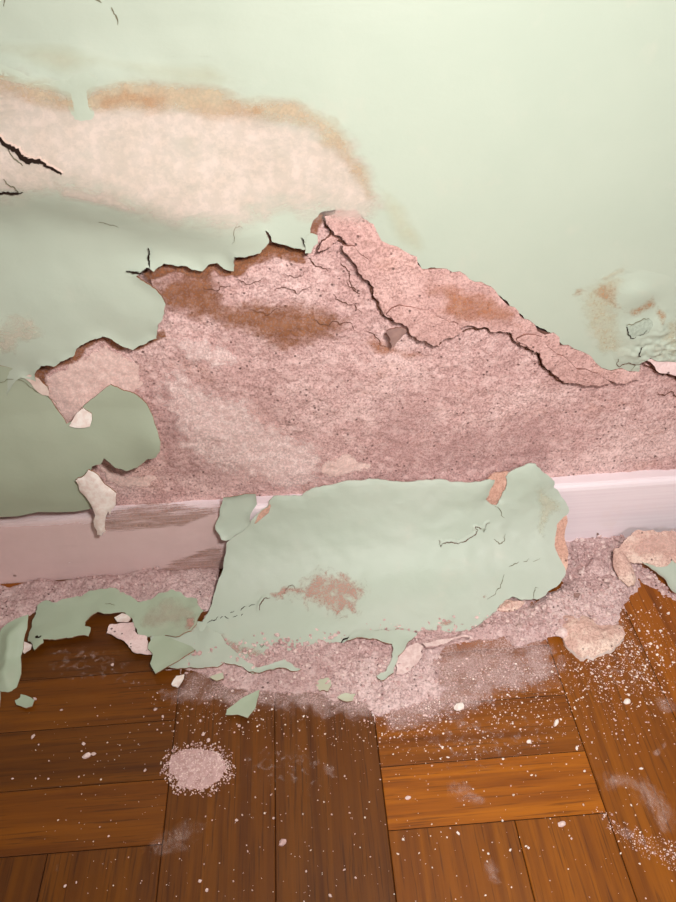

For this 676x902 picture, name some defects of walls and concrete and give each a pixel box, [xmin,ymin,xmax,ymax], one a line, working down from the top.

crack [0,134,64,175]
leakage [0,81,373,234]
crack [0,180,23,195]
leakage [145,239,338,349]
crack [616,318,649,372]
spalling [0,209,676,536]
crack [438,506,505,547]
peeling [114,613,131,622]
peeling [148,635,195,674]
peeling [171,674,184,688]